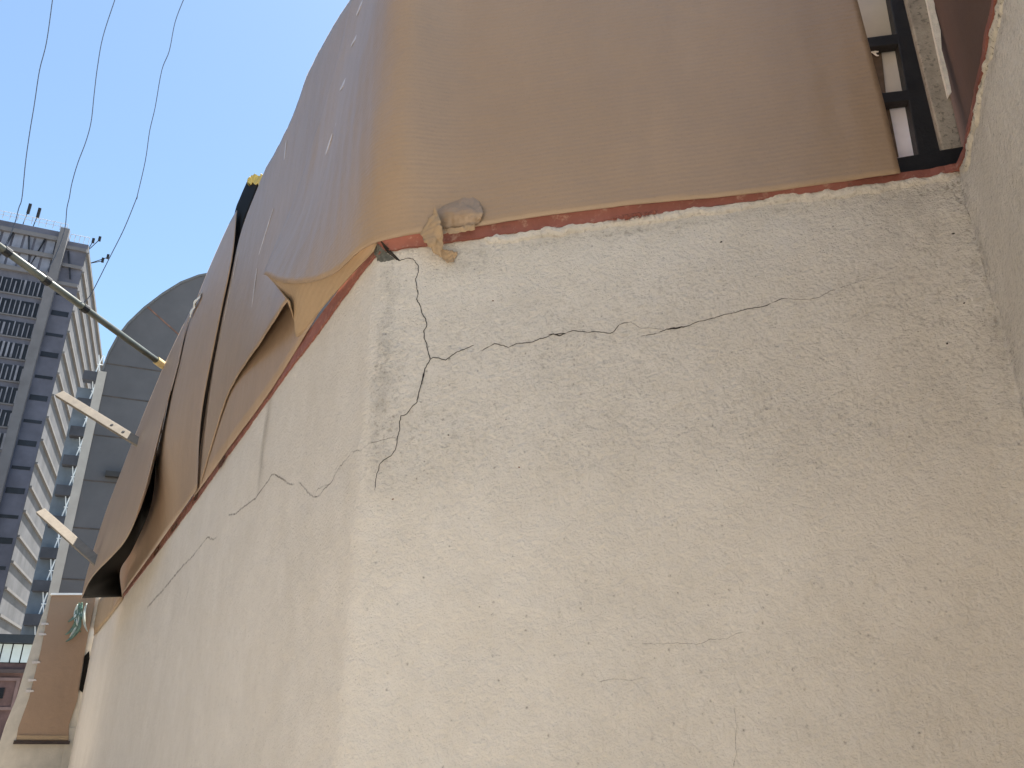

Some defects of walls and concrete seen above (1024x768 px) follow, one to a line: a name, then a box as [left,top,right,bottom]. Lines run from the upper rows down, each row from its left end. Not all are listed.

spalling [374,241,399,262]
crack [375,252,819,487]